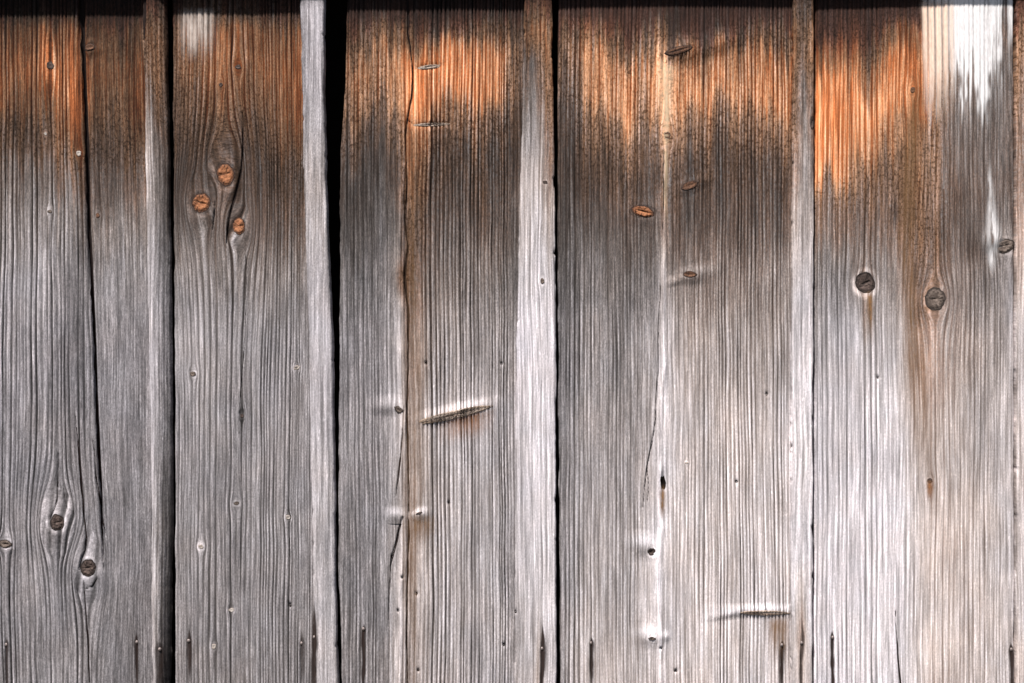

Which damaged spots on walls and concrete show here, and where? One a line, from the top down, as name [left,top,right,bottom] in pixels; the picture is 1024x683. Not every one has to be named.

crack [388,0,413,683]
crack [643,285,661,503]